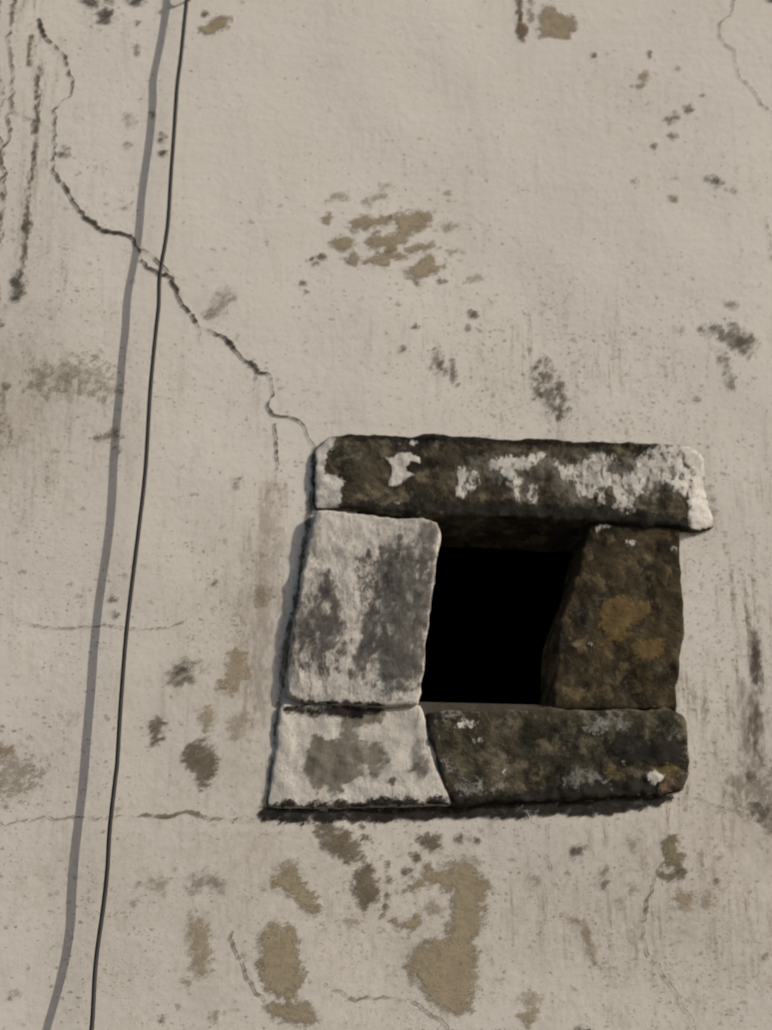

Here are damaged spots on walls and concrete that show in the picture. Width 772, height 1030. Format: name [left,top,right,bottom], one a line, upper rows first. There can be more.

peeling [536,6,577,39]
crack [719,0,768,109]
leakage [9,34,43,303]
peeling [309,183,461,285]
crack [0,0,318,826]
peeling [230,921,318,1028]
crack [325,983,454,1030]
peeling [314,821,491,1018]
crack [641,854,696,1029]